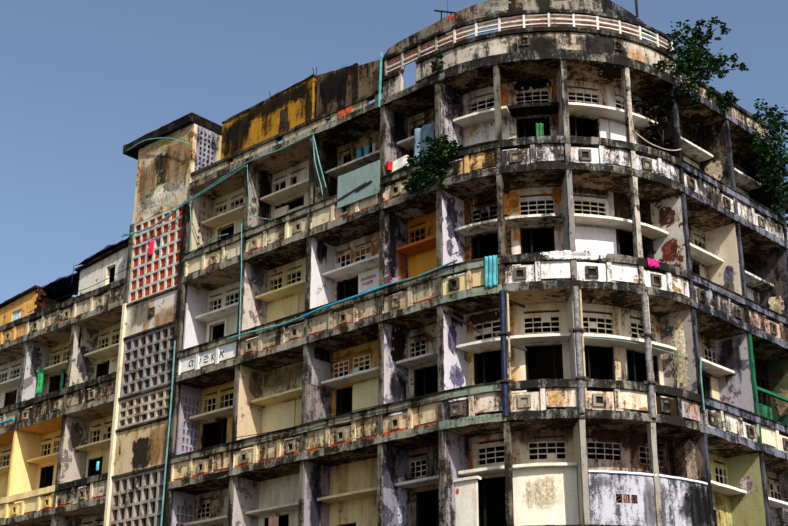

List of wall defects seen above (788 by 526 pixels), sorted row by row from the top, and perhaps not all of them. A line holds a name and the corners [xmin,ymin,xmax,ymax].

water stain [320,69,347,108]
water stain [221,83,312,164]
water stain [138,130,188,205]
peeling [705,161,723,181]
peeling [503,192,521,215]
peeling [768,296,784,314]
water stain [391,371,407,402]
peeling [775,388,788,417]